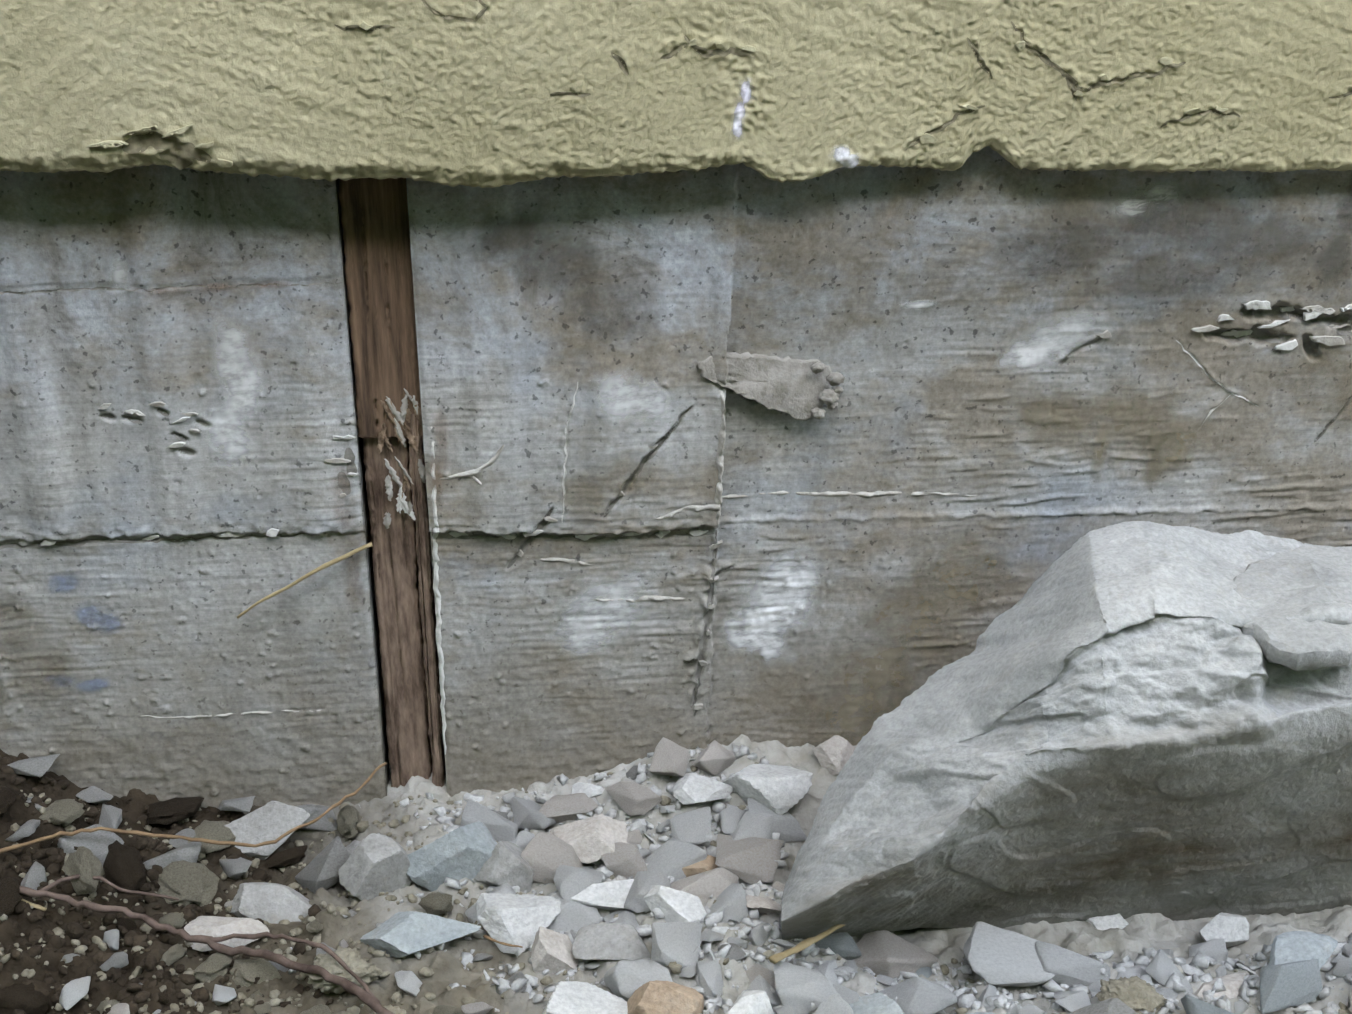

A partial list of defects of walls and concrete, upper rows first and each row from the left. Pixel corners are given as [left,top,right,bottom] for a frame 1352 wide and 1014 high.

spalling [1191,300,1352,356]
hole [98,401,209,455]
crack [441,382,734,716]